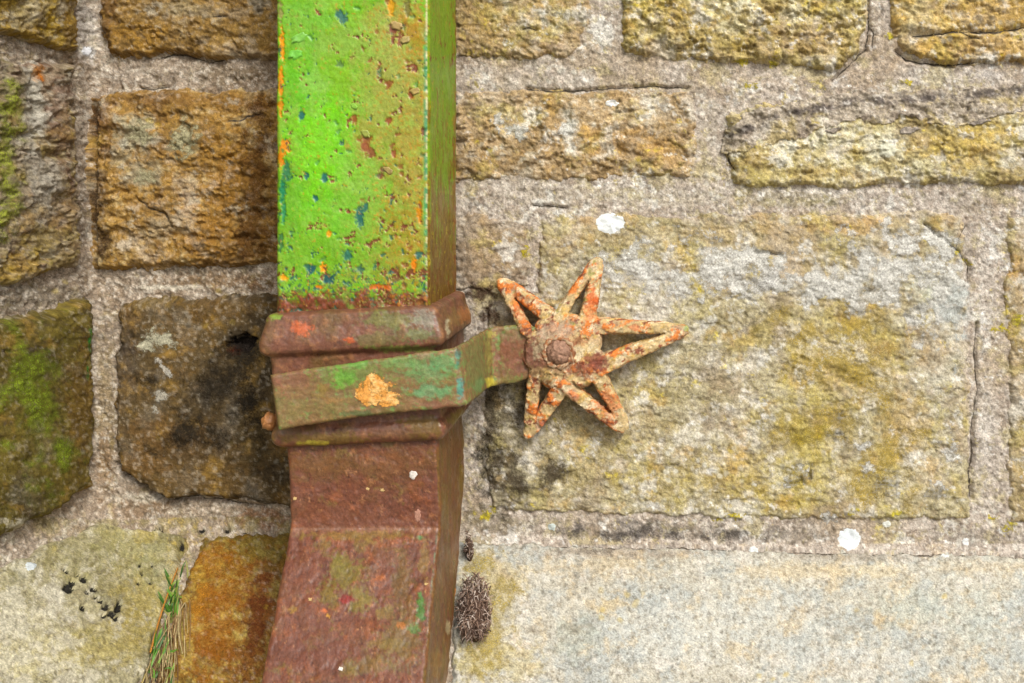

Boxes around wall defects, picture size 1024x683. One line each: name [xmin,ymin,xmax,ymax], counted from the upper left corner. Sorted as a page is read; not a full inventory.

crack [835,1,1022,79]
damp [144,414,230,455]
damp [196,335,271,449]
crack [968,330,978,495]